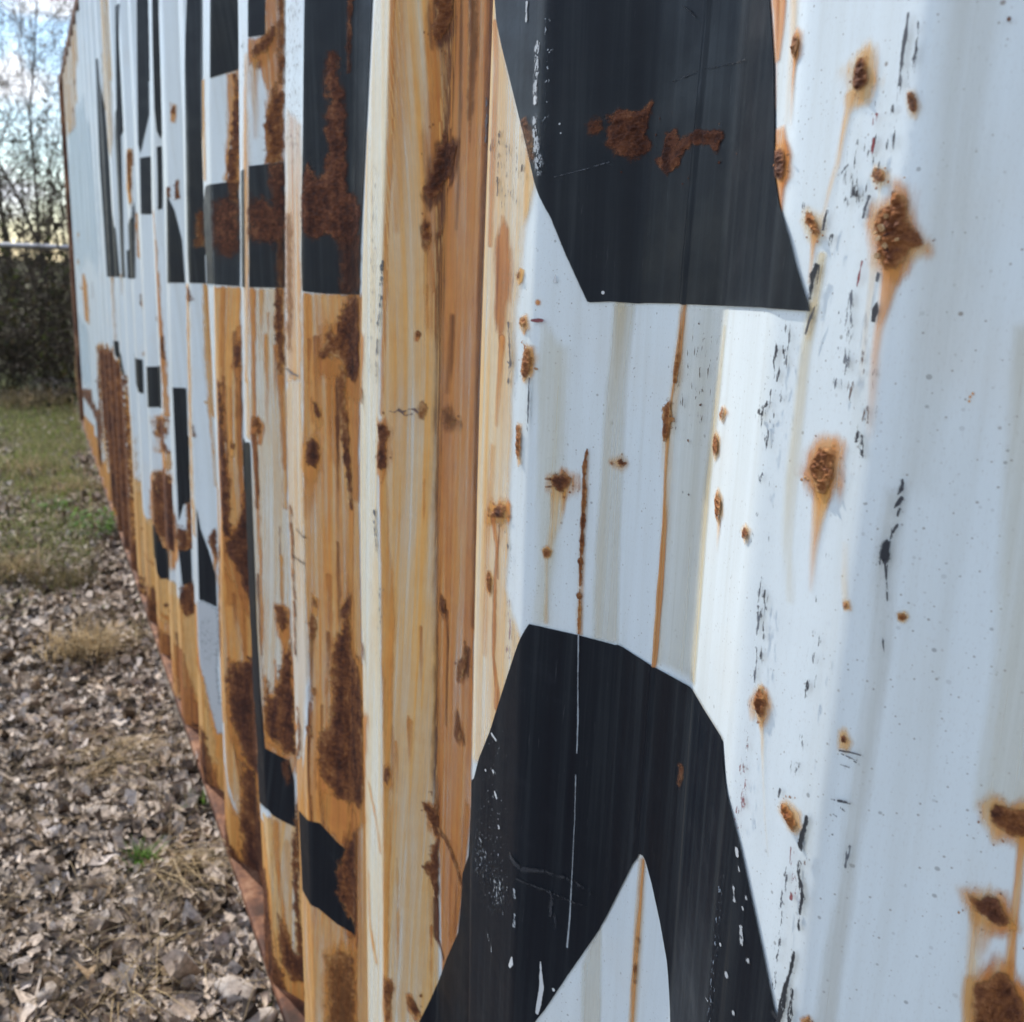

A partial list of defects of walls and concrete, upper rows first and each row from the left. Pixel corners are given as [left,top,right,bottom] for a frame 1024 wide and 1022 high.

corrosion [588,100,724,174]
corrosion [841,47,876,139]
corrosion [867,167,934,331]
corrosion [75,0,543,1022]
corrosion [545,469,574,515]
corrosion [651,306,686,668]
corrosion [800,435,843,544]
corrosion [751,687,768,727]
corrosion [631,860,644,1022]
corrosion [958,798,1024,1022]